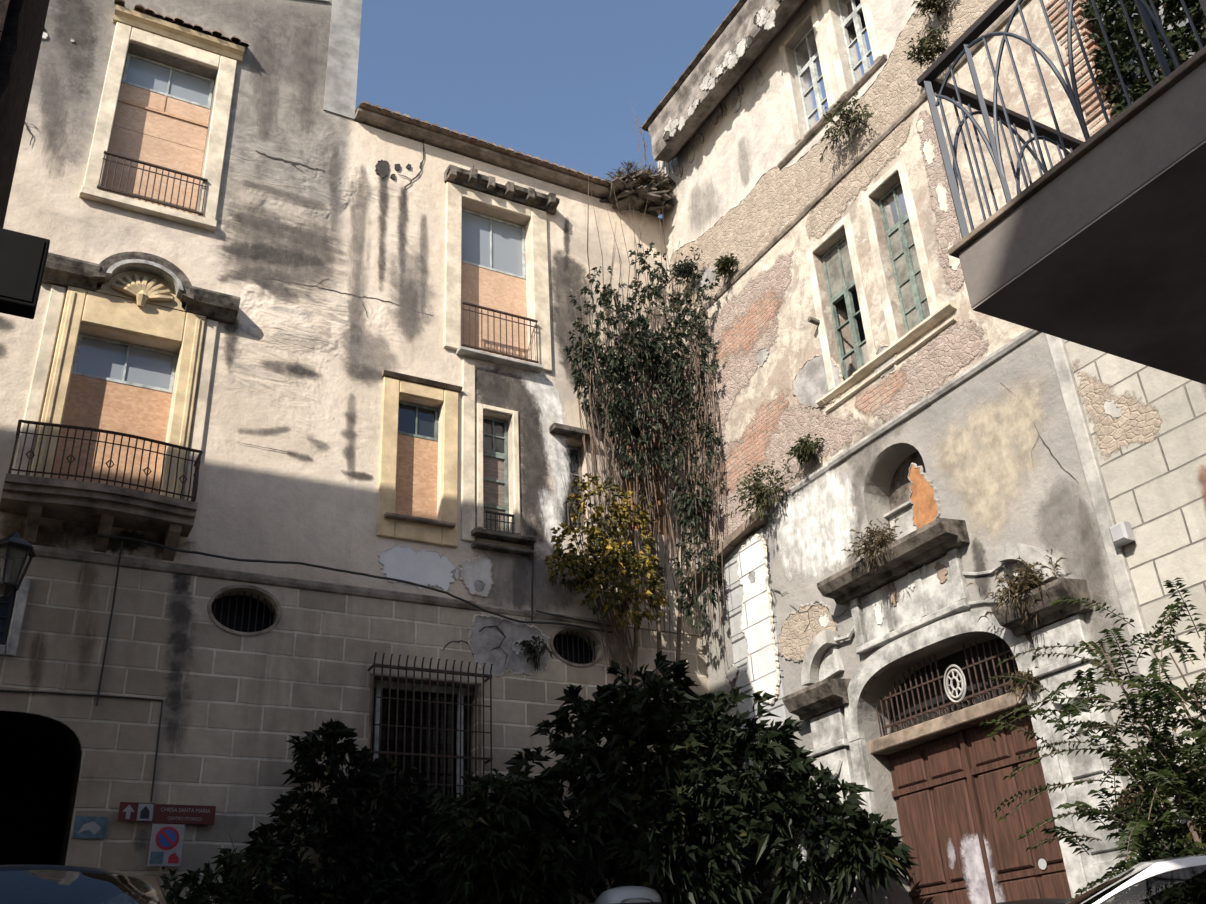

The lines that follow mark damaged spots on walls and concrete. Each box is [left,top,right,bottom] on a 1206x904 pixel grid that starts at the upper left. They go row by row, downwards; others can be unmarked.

damp [38,0,99,151]
damp [220,148,430,381]
flaking render [663,0,996,551]
damp [288,439,326,460]
damp [343,394,372,479]
damp [475,371,510,528]
damp [488,370,575,611]
crack [1001,383,1078,483]
flaking render [454,555,494,598]
flaking render [468,614,550,678]
peeling [725,533,839,705]
peeling [874,561,948,625]